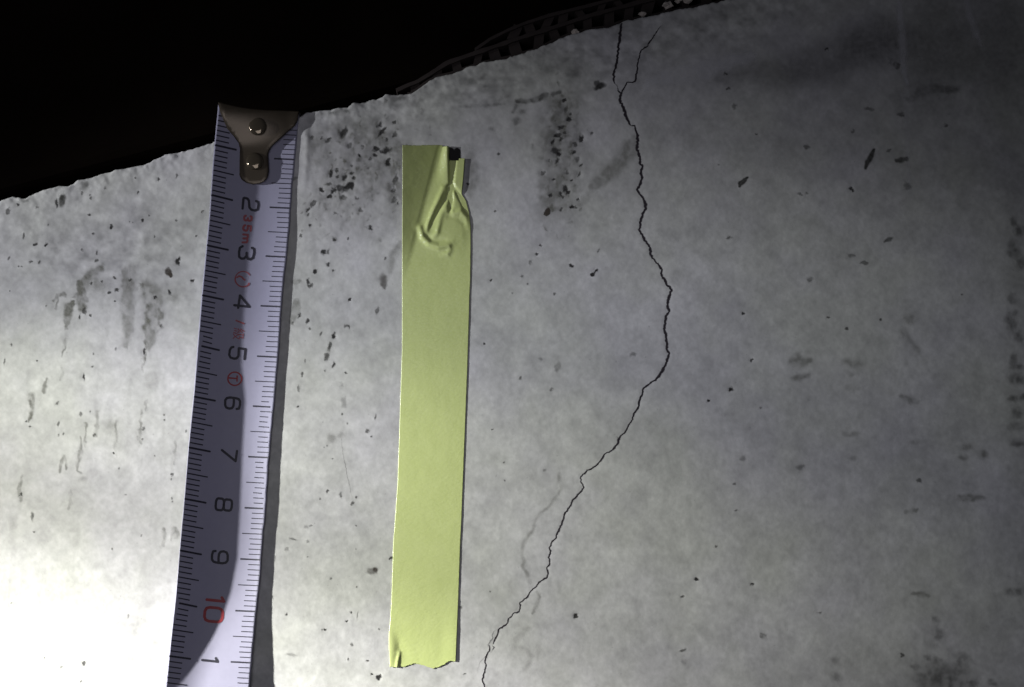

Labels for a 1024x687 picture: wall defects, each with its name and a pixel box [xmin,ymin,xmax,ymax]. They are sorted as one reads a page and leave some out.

damp [65,266,103,316]
crack [482,23,673,687]